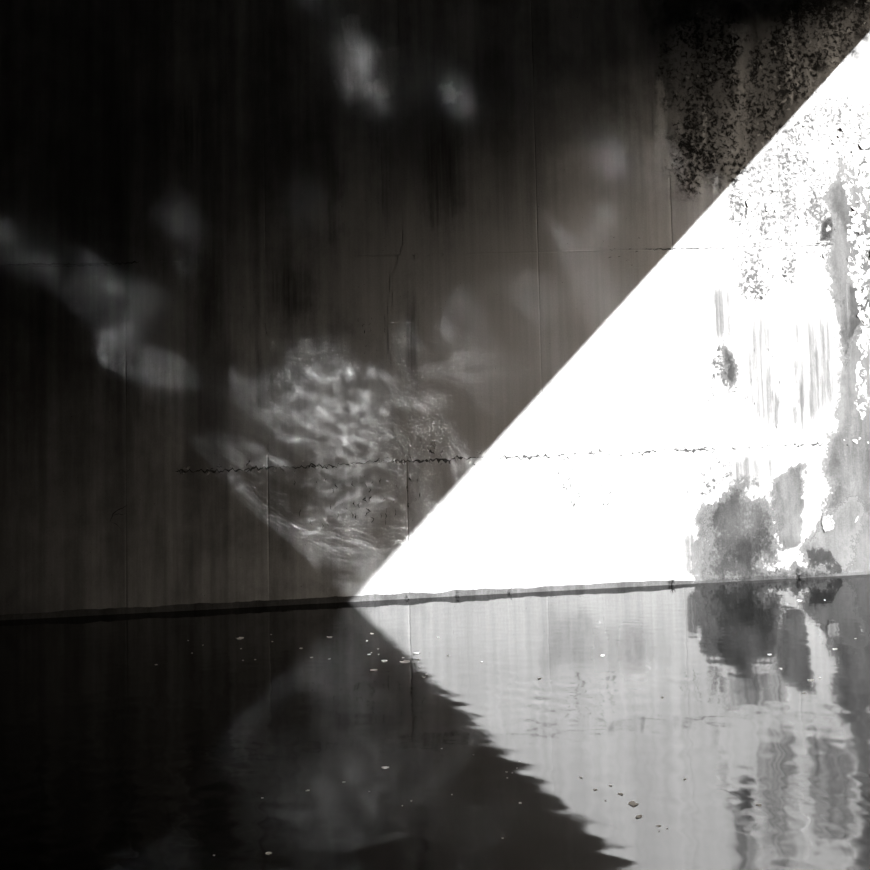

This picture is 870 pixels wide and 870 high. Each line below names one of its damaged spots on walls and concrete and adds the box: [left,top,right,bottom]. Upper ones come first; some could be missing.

water stain [650,58,674,179]
water stain [723,24,752,108]
water stain [779,24,800,108]
peeling [658,0,870,419]
water stain [0,127,870,620]
crack [175,377,869,528]